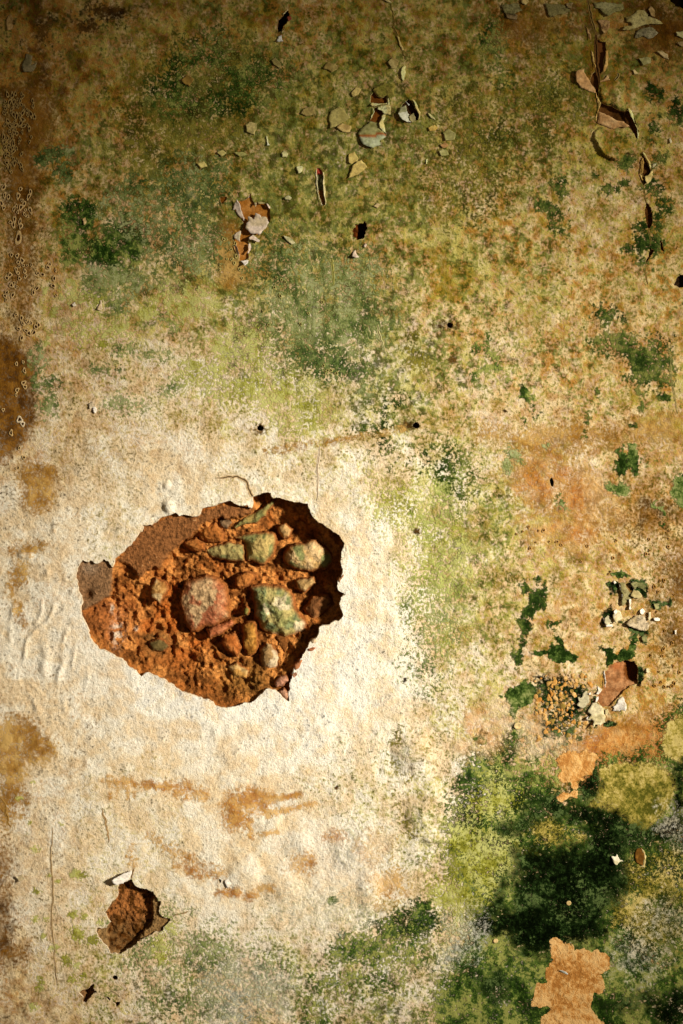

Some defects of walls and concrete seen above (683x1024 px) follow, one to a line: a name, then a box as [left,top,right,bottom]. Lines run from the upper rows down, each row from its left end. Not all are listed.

peeling [594,2,663,39]
peeling [329,82,456,178]
peeling [598,79,630,111]
peeling [592,127,642,161]
peeling [216,194,271,280]
leakage [0,335,37,461]
spalling [76,492,345,708]
peeling [572,556,681,727]
peeling [453,700,599,802]
leakage [559,710,670,785]
spalling [96,868,189,954]
peeling [531,937,610,1024]